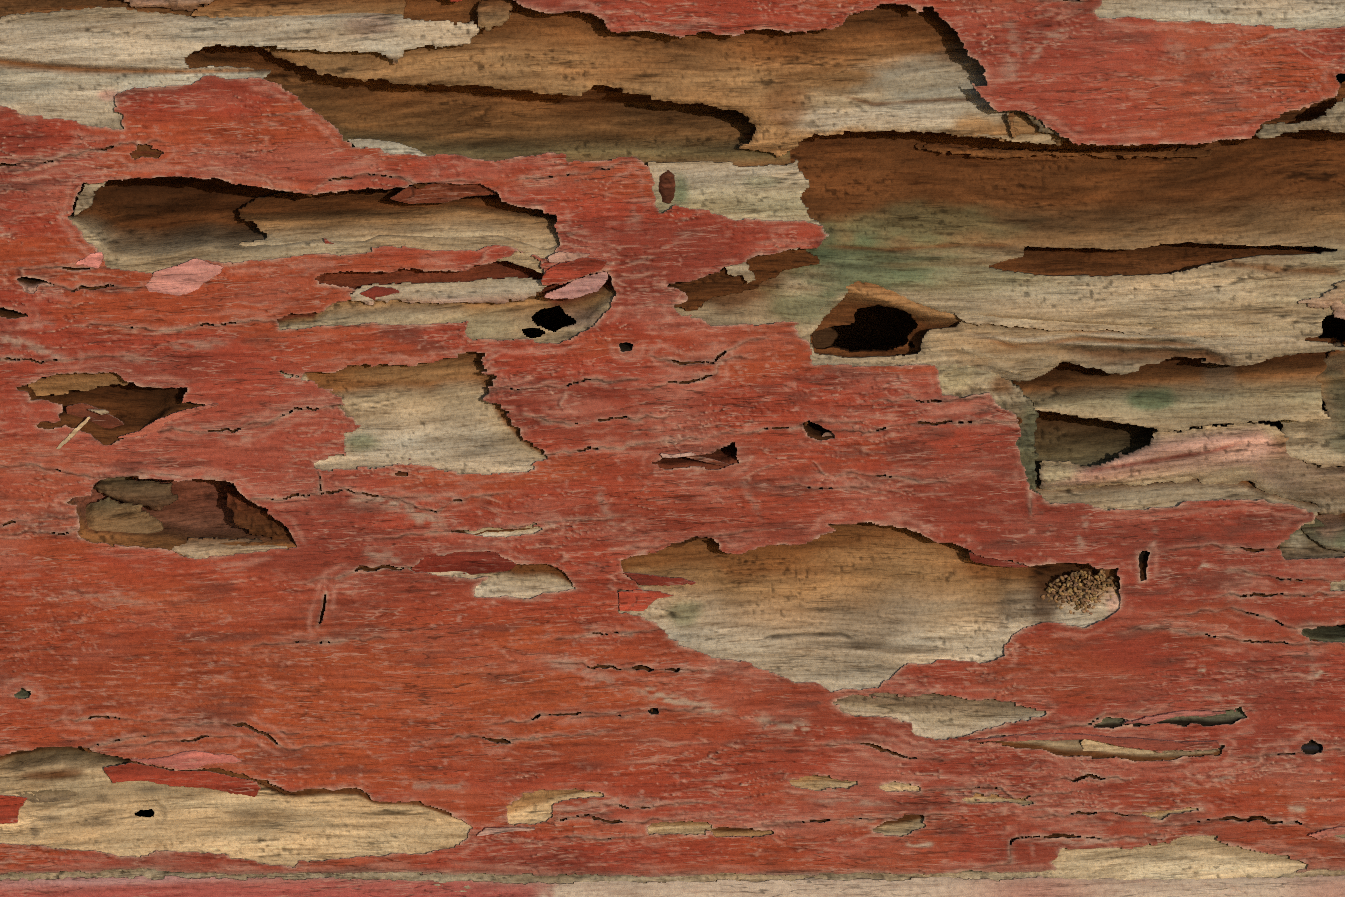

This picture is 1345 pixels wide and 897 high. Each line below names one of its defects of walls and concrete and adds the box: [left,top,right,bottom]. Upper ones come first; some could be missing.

peeling [0,6,480,129]
peeling [648,159,830,237]
crack [668,351,726,384]
peeling [279,352,548,478]
crack [876,400,972,431]
peeling [397,551,575,599]
crack [1205,546,1331,644]
crack [587,632,680,672]
peeling [833,693,1247,761]
peeling [0,746,604,868]
crack [1010,774,1128,845]
crack [1197,816,1302,825]